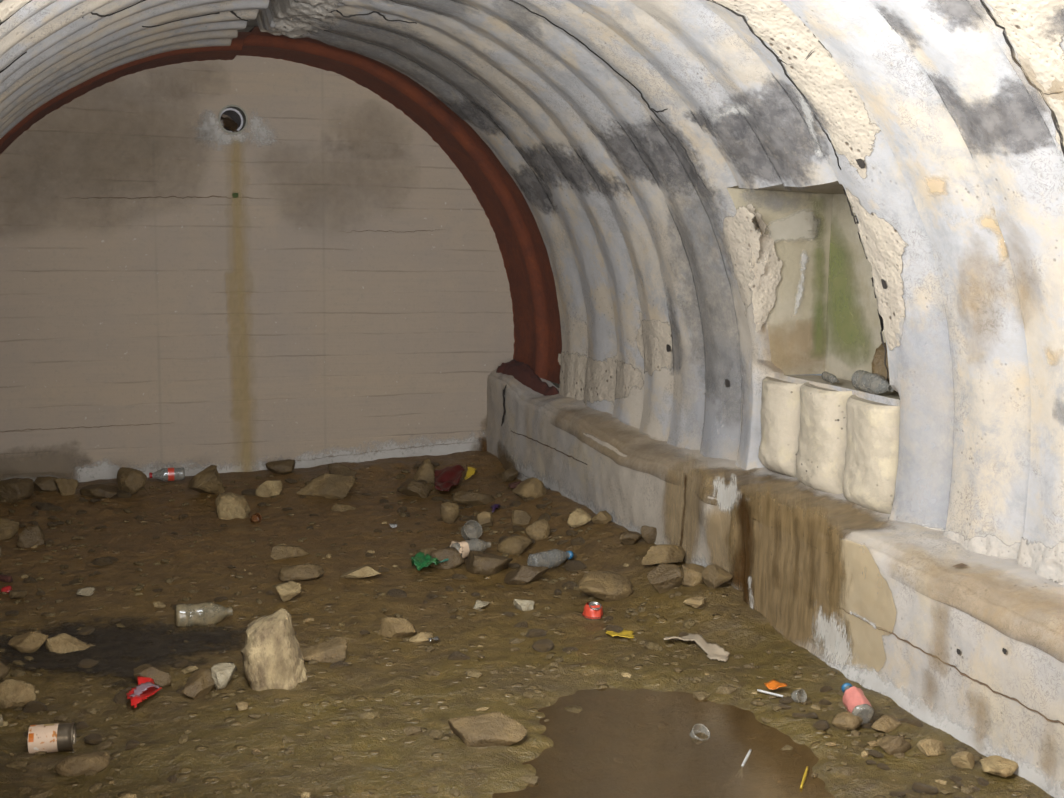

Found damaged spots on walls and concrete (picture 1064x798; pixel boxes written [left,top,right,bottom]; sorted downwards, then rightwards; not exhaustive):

water stain [197,111,275,145]
spalling [268,0,342,39]
water stain [713,105,749,117]
spalling [710,0,881,179]
spalling [984,0,1064,147]
crack [60,193,277,201]
spalling [723,203,821,332]
spalling [846,188,909,350]
water stain [478,439,598,514]
spalling [924,526,1064,585]
water stain [665,466,1064,798]
crack [839,608,1064,725]